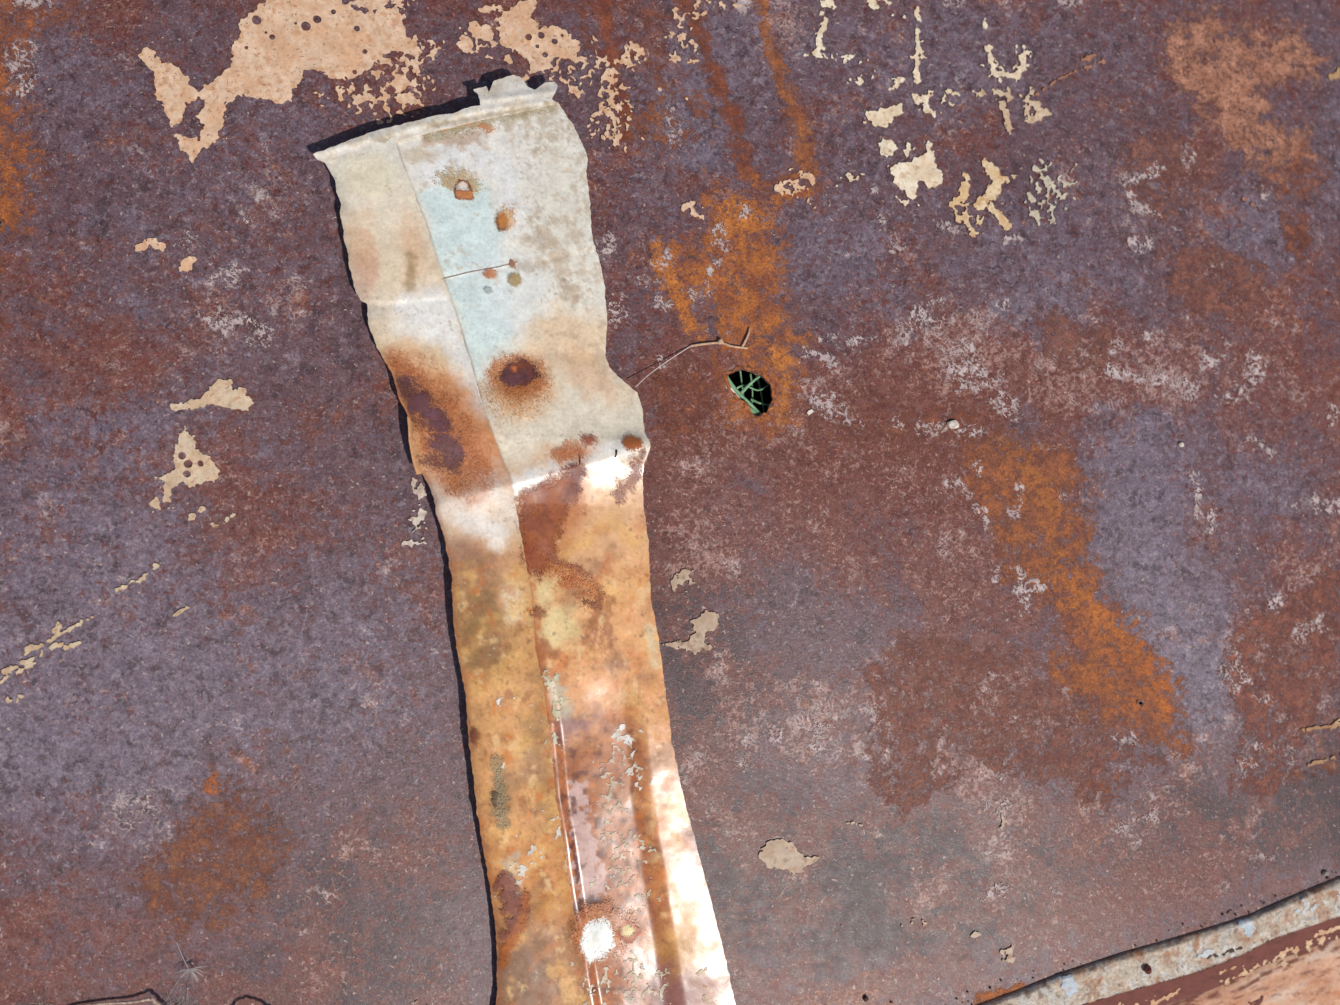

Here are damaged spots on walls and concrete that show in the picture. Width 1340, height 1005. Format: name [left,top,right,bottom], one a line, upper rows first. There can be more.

rust [294,15,321,31]
rust [342,0,377,14]
peeling [664,0,742,64]
peeling [803,0,875,86]
peeling [138,0,647,163]
peeling [863,0,1052,206]
peeling [681,201,704,220]
peeling [774,168,816,209]
peeling [949,154,1078,237]
peeling [149,379,254,513]
peeling [758,839,820,876]